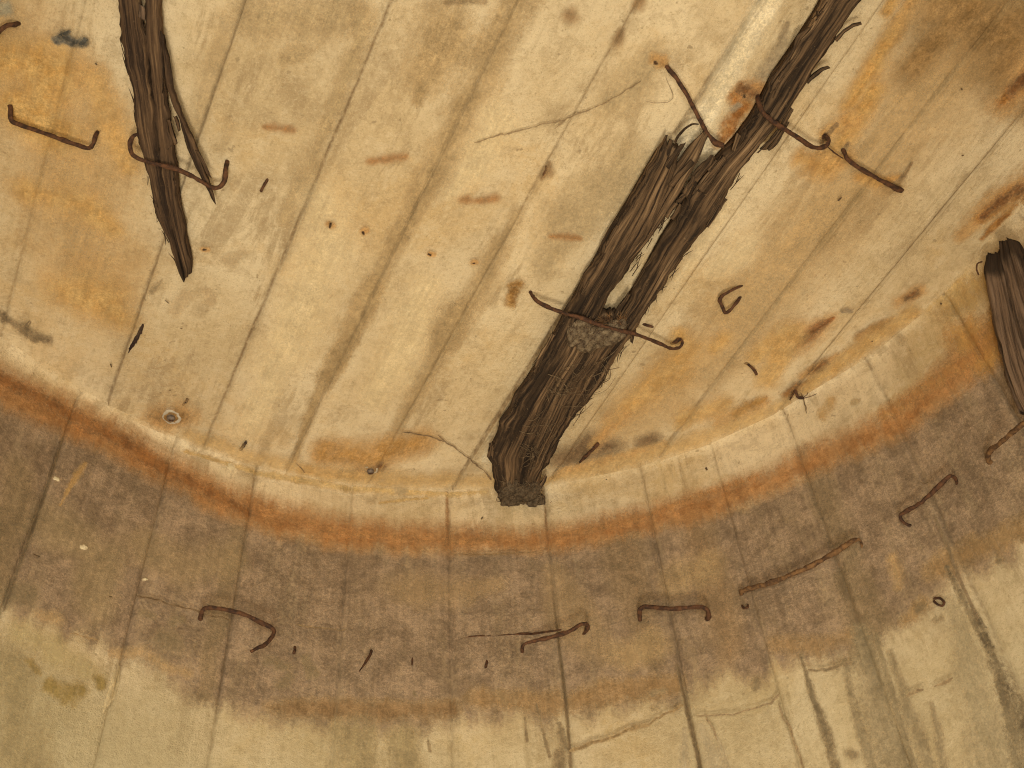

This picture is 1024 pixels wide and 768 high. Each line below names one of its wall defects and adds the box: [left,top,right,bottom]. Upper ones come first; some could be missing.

rust [0,40,138,175]
crack [474,79,673,143]
damp [672,0,789,161]
rust [714,81,764,148]
rust [855,173,901,188]
rust [0,273,1001,554]
damp [0,357,1024,768]